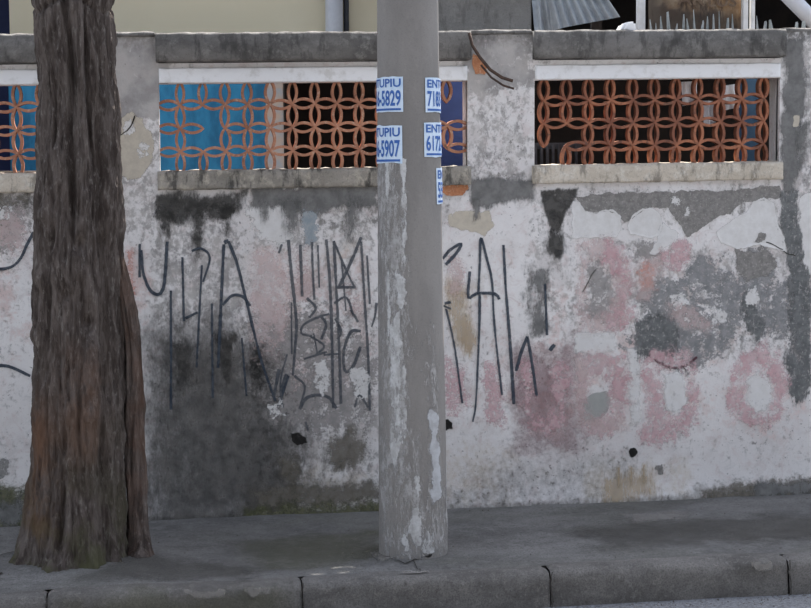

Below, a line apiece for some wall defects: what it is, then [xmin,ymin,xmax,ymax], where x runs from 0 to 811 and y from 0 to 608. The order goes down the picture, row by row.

peeling [120,112,154,181]
peeling [236,158,453,560]
peeling [448,210,494,236]
peeling [571,186,795,425]